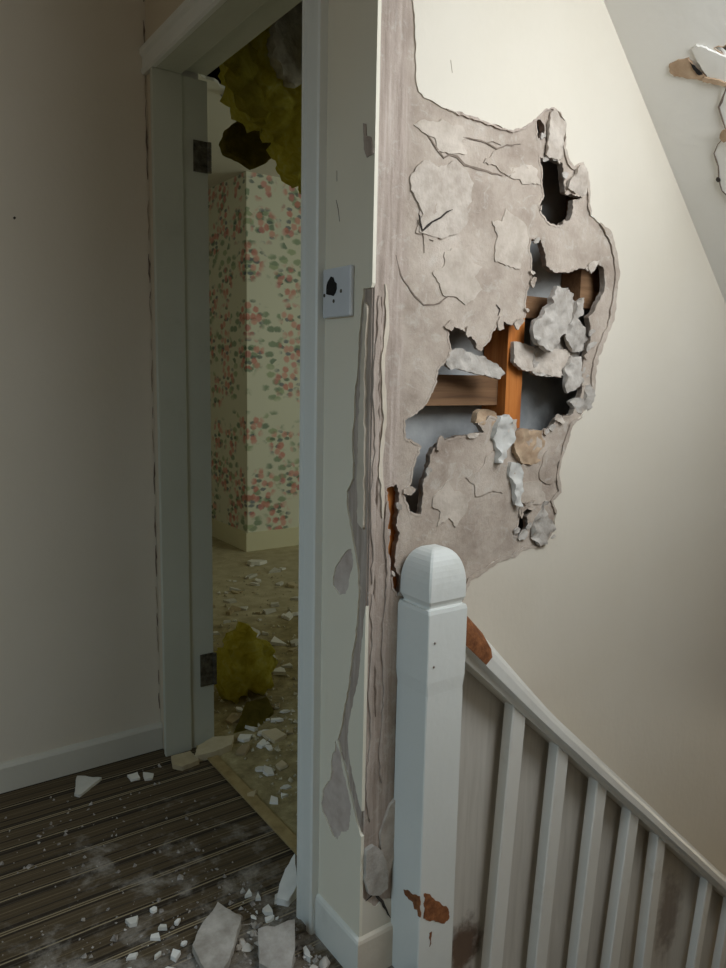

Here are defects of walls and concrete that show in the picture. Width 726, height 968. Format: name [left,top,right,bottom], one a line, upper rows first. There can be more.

flaking render [322,0,620,906]
peeling [404,890,450,947]